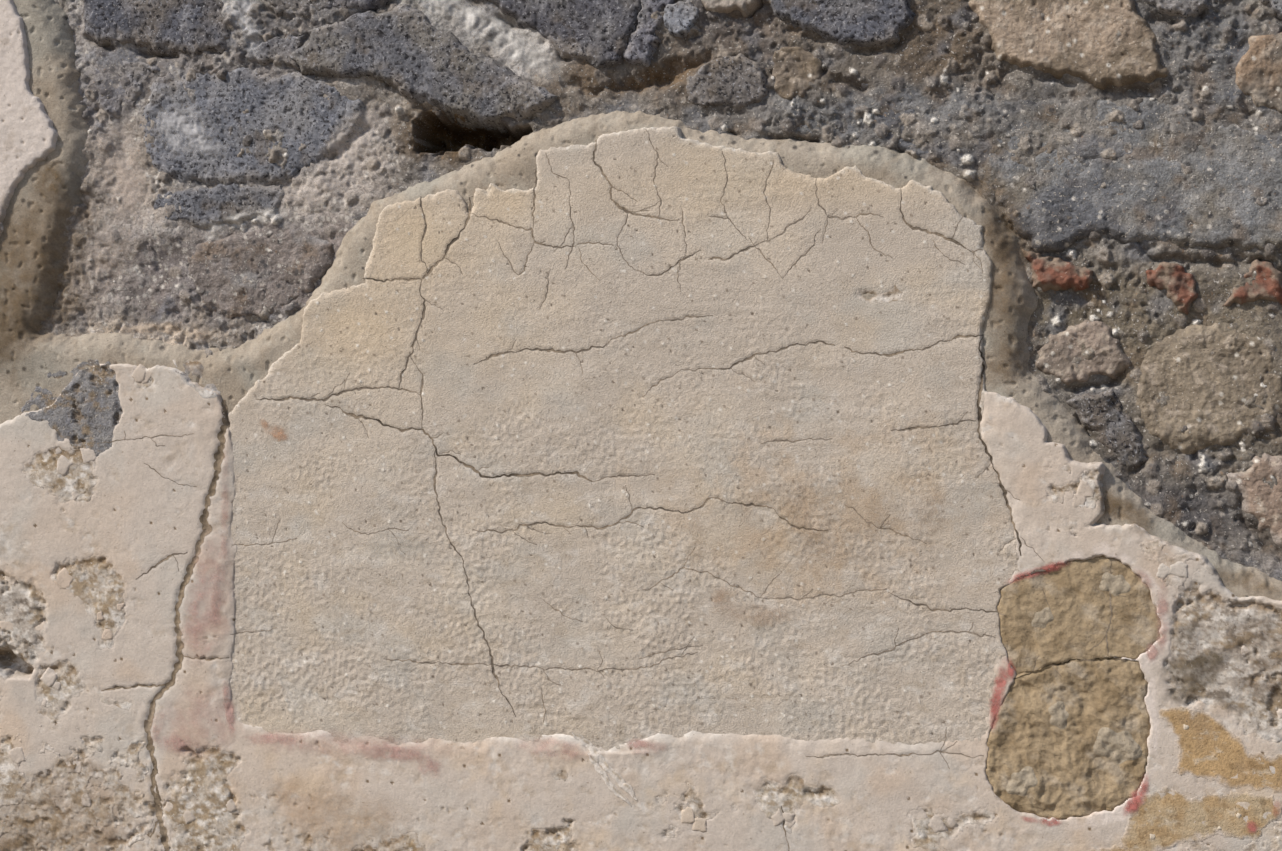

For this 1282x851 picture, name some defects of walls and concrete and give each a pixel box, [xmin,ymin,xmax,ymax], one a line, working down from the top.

spalling [856,285,903,303]
flaking render [20,359,154,512]
spalling [173,359,220,399]
crack [258,130,1004,722]
crack [644,335,1135,679]
spalling [1044,456,1105,535]
spalling [0,554,133,723]
crack [101,400,296,851]
crack [806,734,984,769]
spalling [908,555,1282,851]